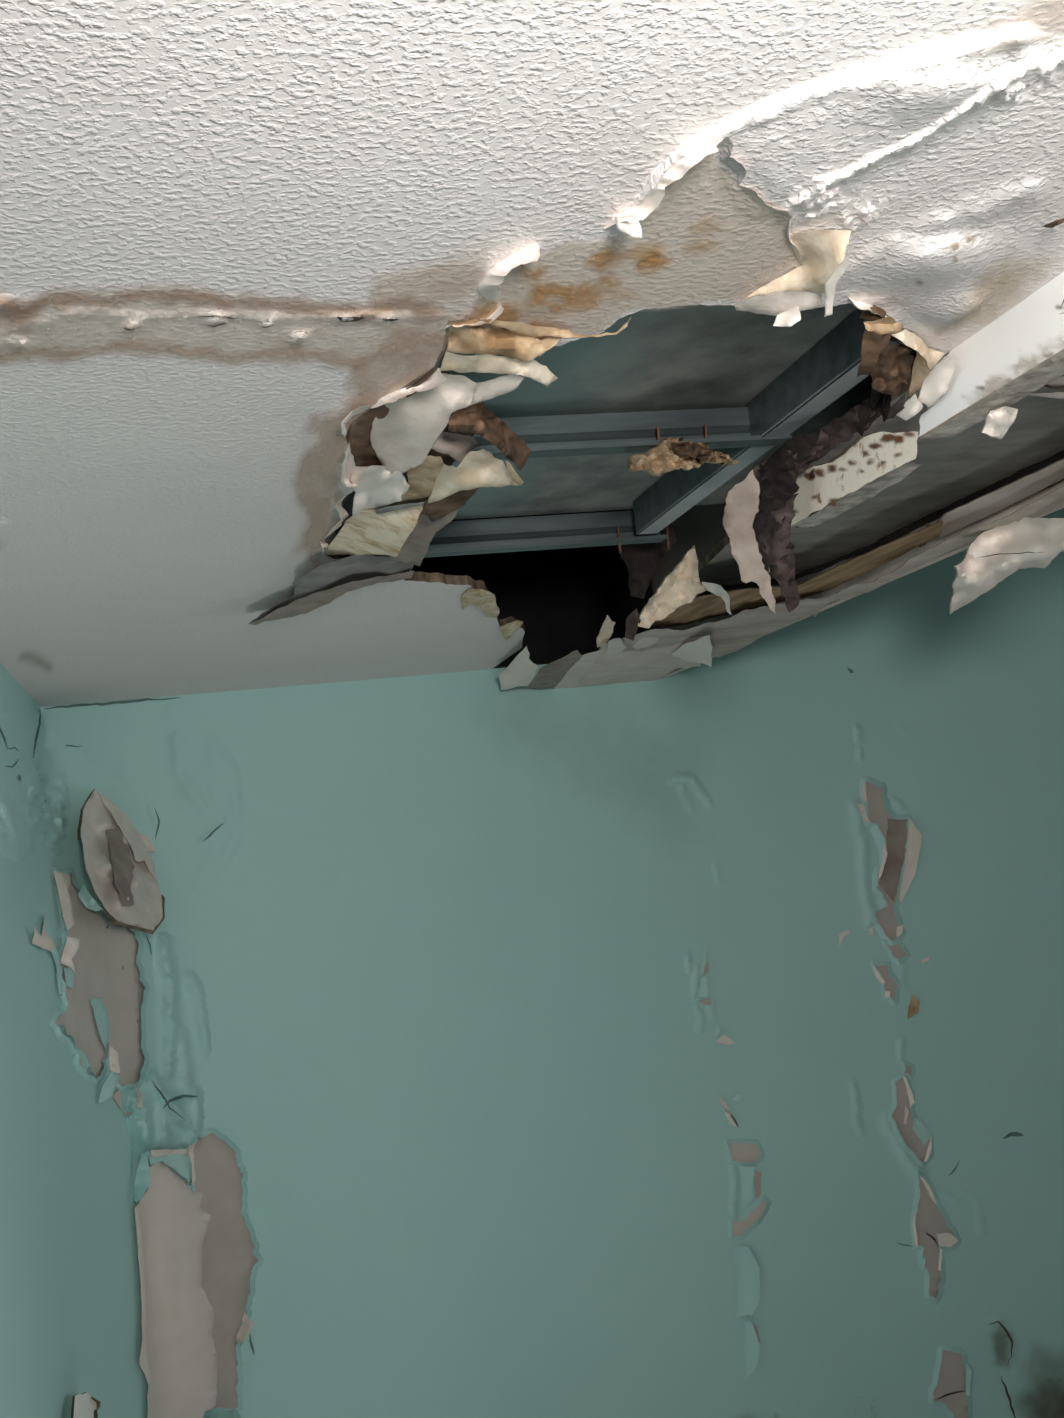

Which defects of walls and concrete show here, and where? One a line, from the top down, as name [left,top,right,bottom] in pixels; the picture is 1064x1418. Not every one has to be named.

leakage [0,292,439,318]
spalling [452,509,633,521]
spalling [804,431,914,506]
spalling [412,545,657,669]
peeling [949,517,1064,614]
peeling [839,718,989,1311]
peeling [32,867,263,1418]
peeling [927,1345,974,1418]
leakage [988,1321,1016,1418]
peeling [983,1315,1039,1418]